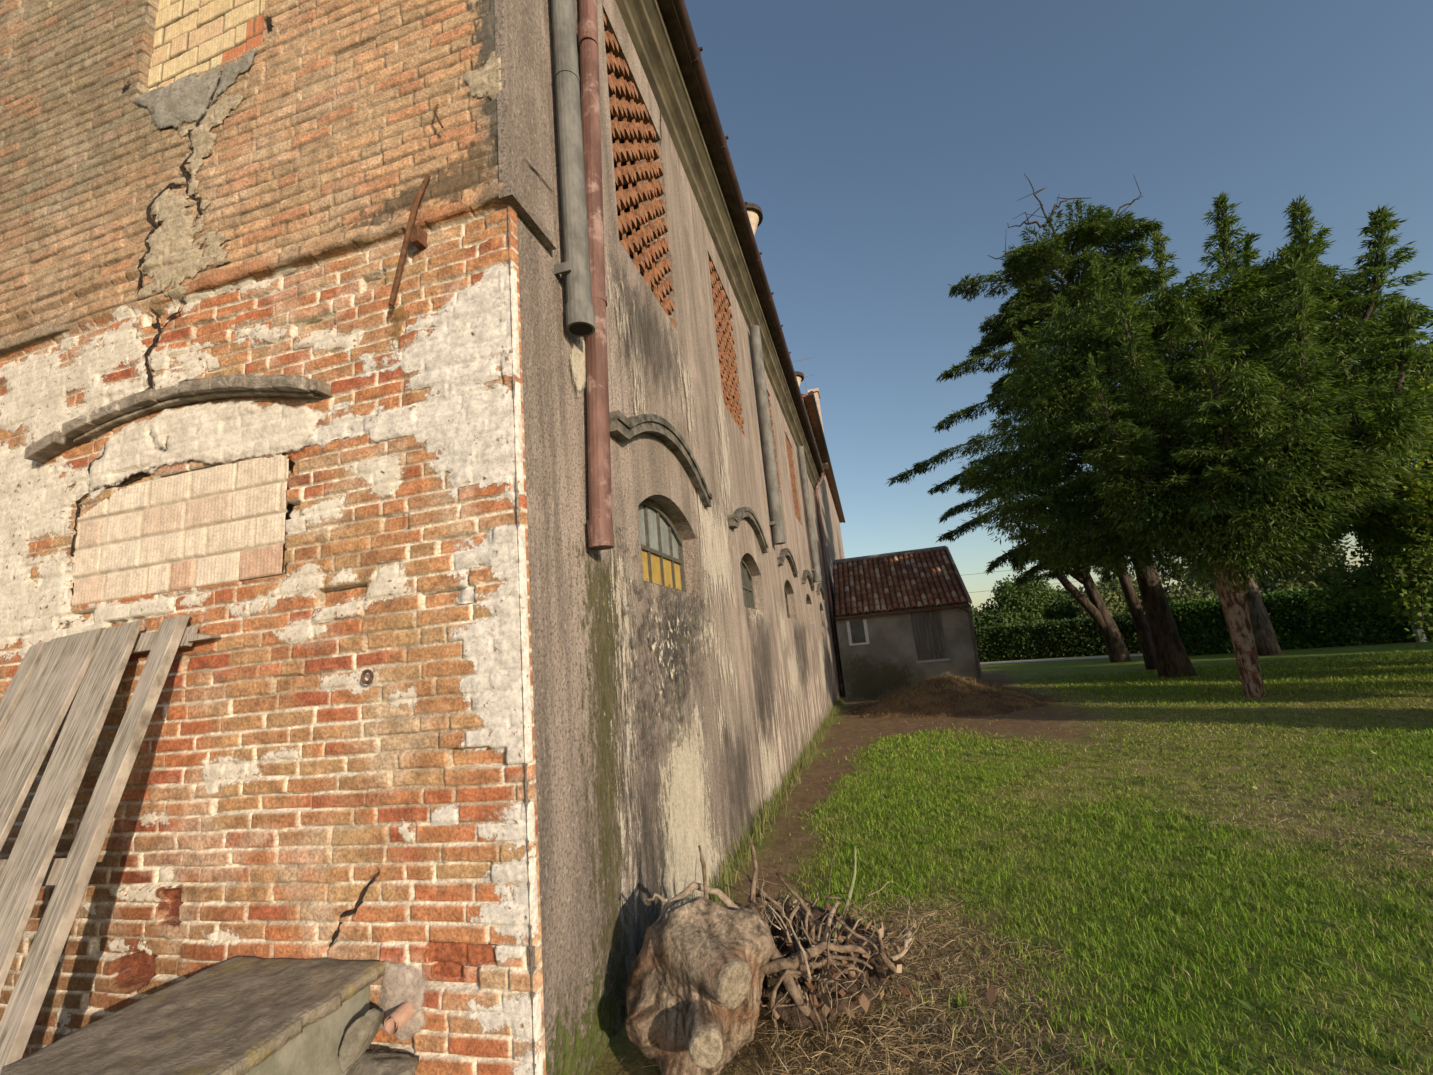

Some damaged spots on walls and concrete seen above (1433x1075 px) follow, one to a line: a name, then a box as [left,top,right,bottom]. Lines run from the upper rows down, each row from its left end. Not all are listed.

crack [133,68,222,389]
peeling [0,261,524,662]
peeling [320,666,419,709]
peeling [447,524,533,765]
leakage [545,266,826,1075]
peeling [201,747,302,795]
peeling [141,810,170,827]
peeling [82,864,183,927]
spalling [107,937,158,994]
peeling [201,929,241,946]
crack [329,872,379,947]
peeling [394,800,543,1075]